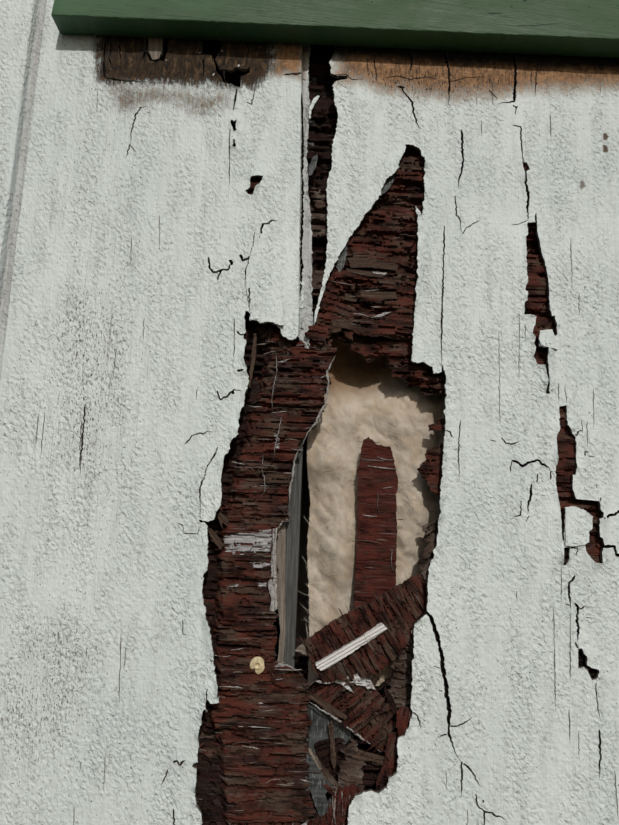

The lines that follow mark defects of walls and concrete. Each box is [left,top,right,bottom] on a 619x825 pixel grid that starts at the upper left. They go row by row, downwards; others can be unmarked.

water stain [93,35,303,105]
peeling [247,177,262,195]
crack [335,49,543,364]
peeling [246,233,285,326]
peeling [305,270,356,346]
peeling [538,329,561,350]
peeling [200,448,225,522]
peeling [564,507,593,563]
crack [600,545,619,557]
crack [553,547,618,814]
crack [425,611,506,825]